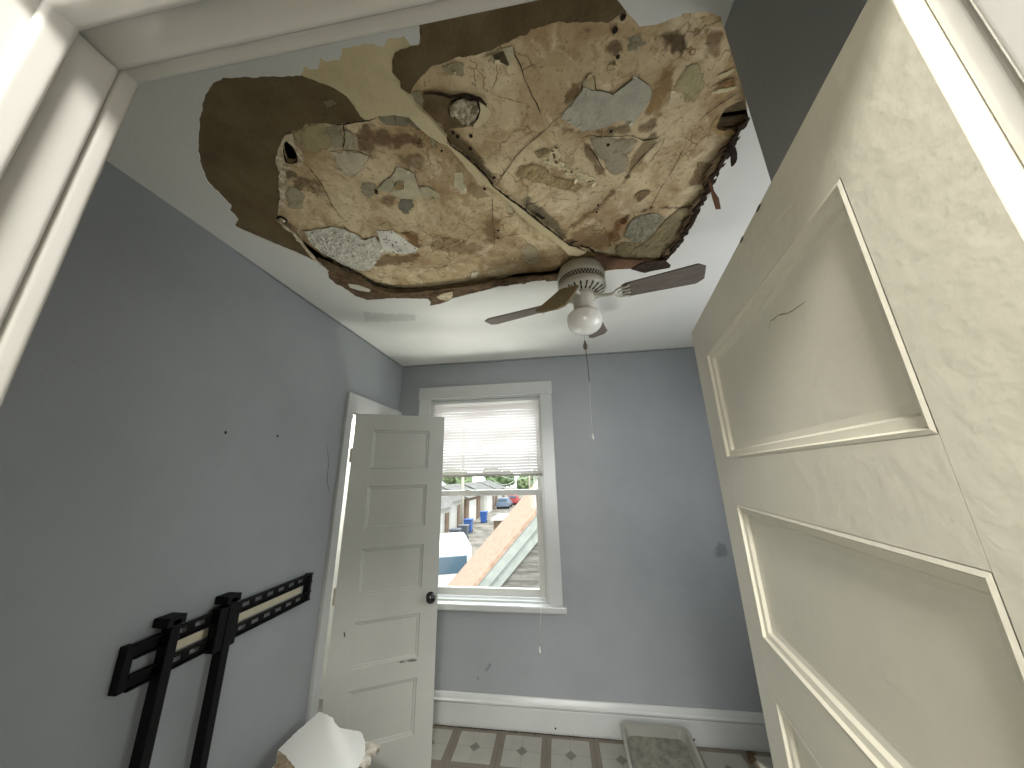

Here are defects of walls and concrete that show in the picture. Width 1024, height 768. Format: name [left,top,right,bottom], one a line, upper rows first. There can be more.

crack [332,118,376,156]
crack [377,167,440,194]
flaking render [277,12,746,306]
crack [403,48,650,277]
crack [581,93,736,214]
crack [769,301,806,328]